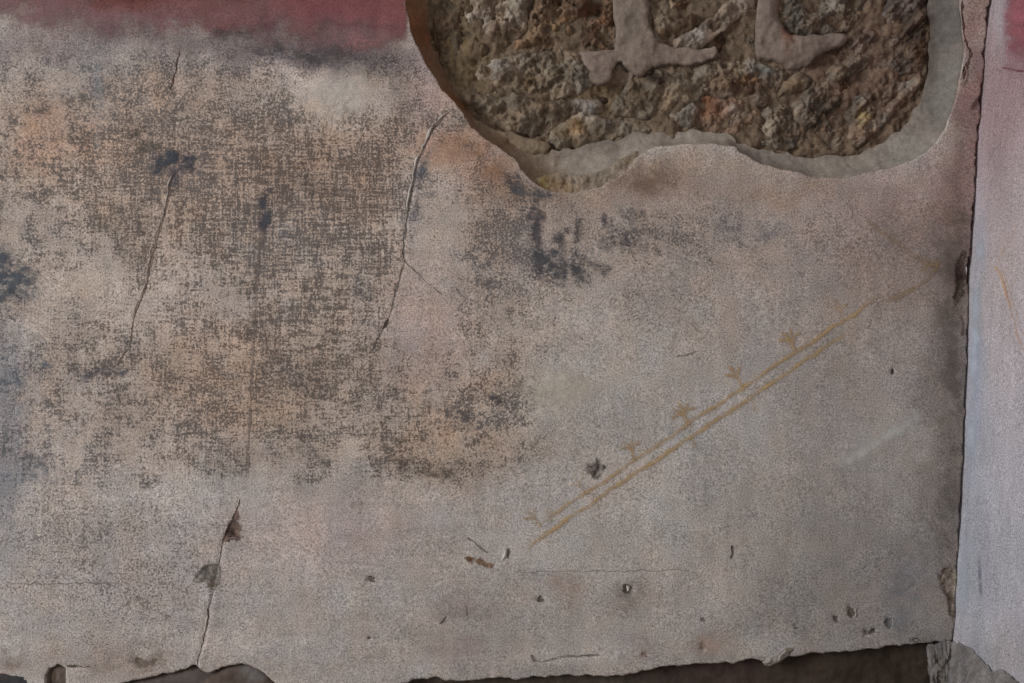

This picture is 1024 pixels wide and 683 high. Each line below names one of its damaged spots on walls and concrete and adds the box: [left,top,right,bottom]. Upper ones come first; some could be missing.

flaking render [405,0,965,193]
crack [118,172,176,364]
crack [371,113,465,351]
crack [197,500,240,664]